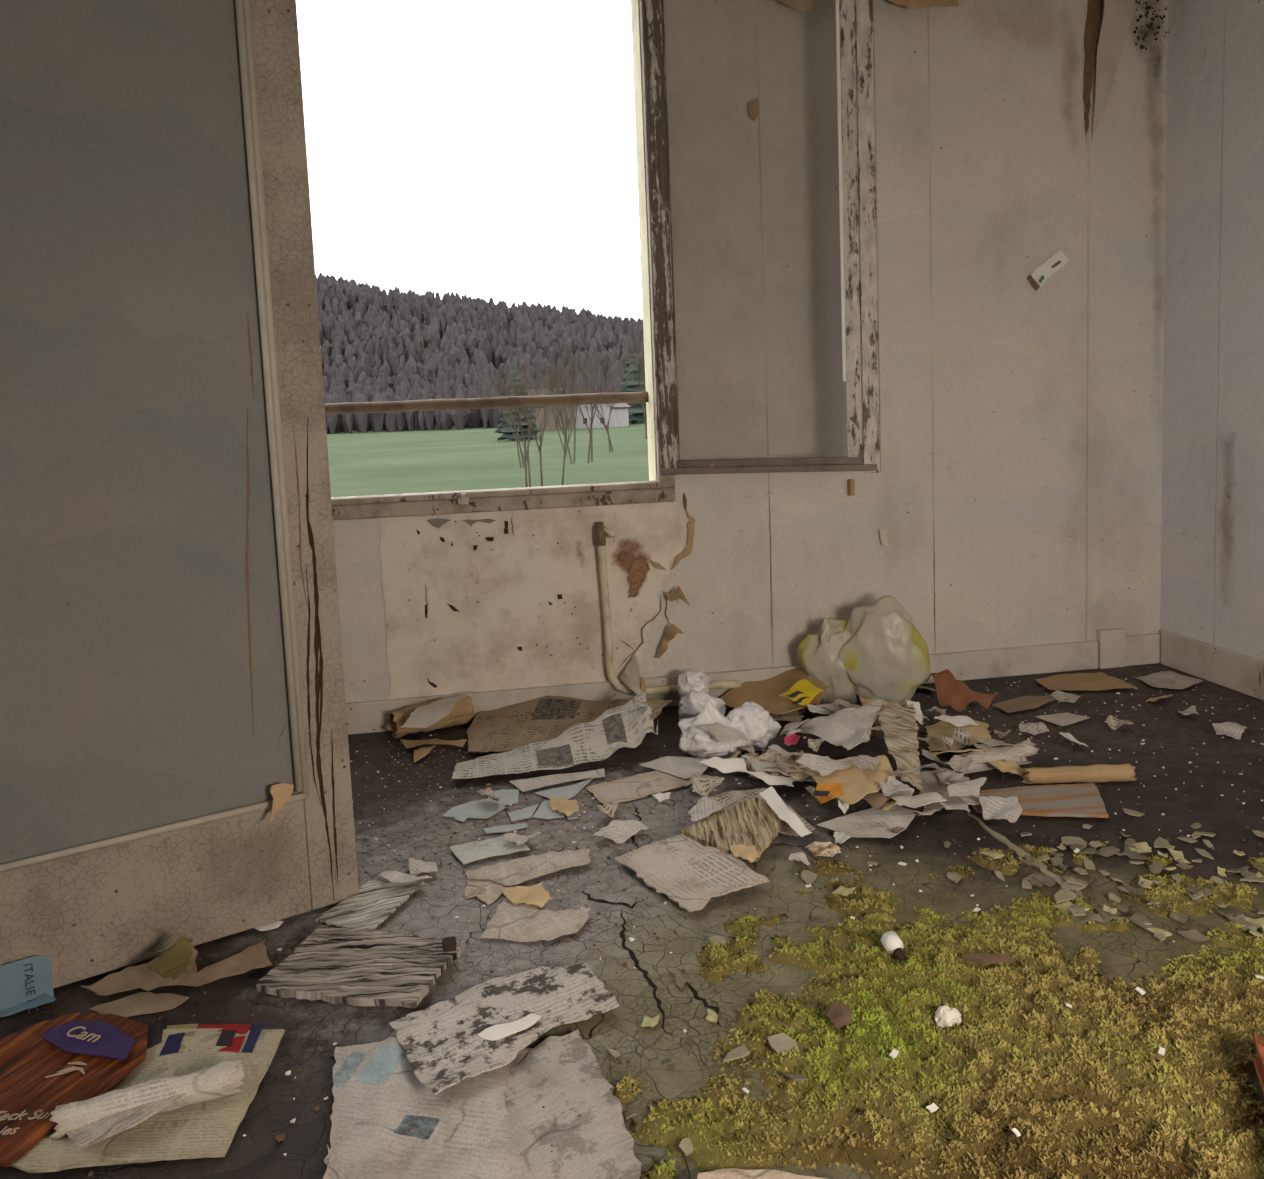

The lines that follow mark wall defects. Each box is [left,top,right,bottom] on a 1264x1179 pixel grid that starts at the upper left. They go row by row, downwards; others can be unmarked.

water stain [1134,0,1170,50]
crack [246,321,255,715]
crack [279,419,338,896]